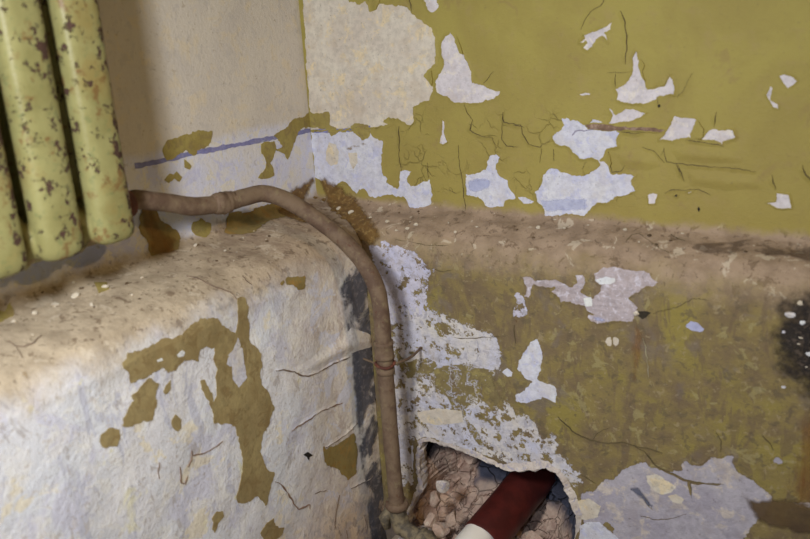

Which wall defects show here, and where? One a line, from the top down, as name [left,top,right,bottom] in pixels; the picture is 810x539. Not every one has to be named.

peeling [577,19,616,54]
peeling [301,0,502,210]
crack [448,105,562,211]
peeling [463,48,740,219]
crack [606,152,627,174]
crack [620,132,776,198]
crack [685,110,724,148]
peeling [764,72,800,111]
peeling [764,191,794,211]
peeling [227,338,247,387]
flaking render [369,241,778,539]
crack [556,417,723,520]